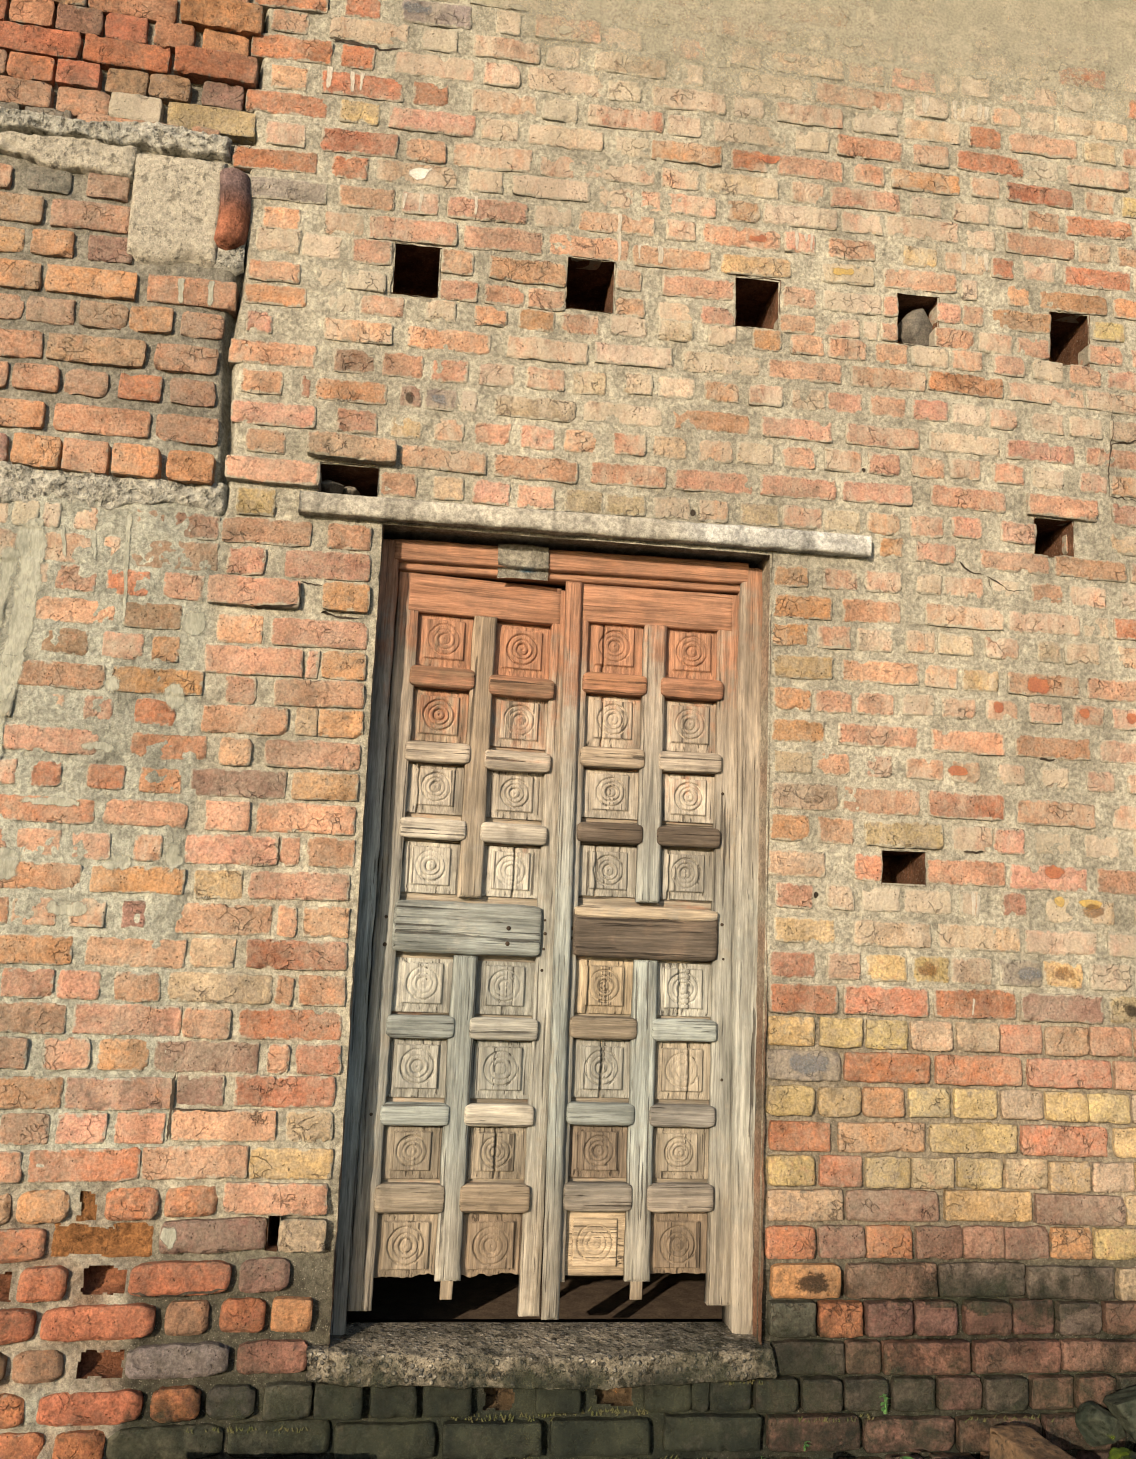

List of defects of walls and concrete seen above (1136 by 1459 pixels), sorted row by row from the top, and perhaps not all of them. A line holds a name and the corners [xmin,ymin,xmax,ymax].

spalling [50,1191,154,1295]
spalling [0,1272,12,1302]
spalling [76,1349,125,1379]